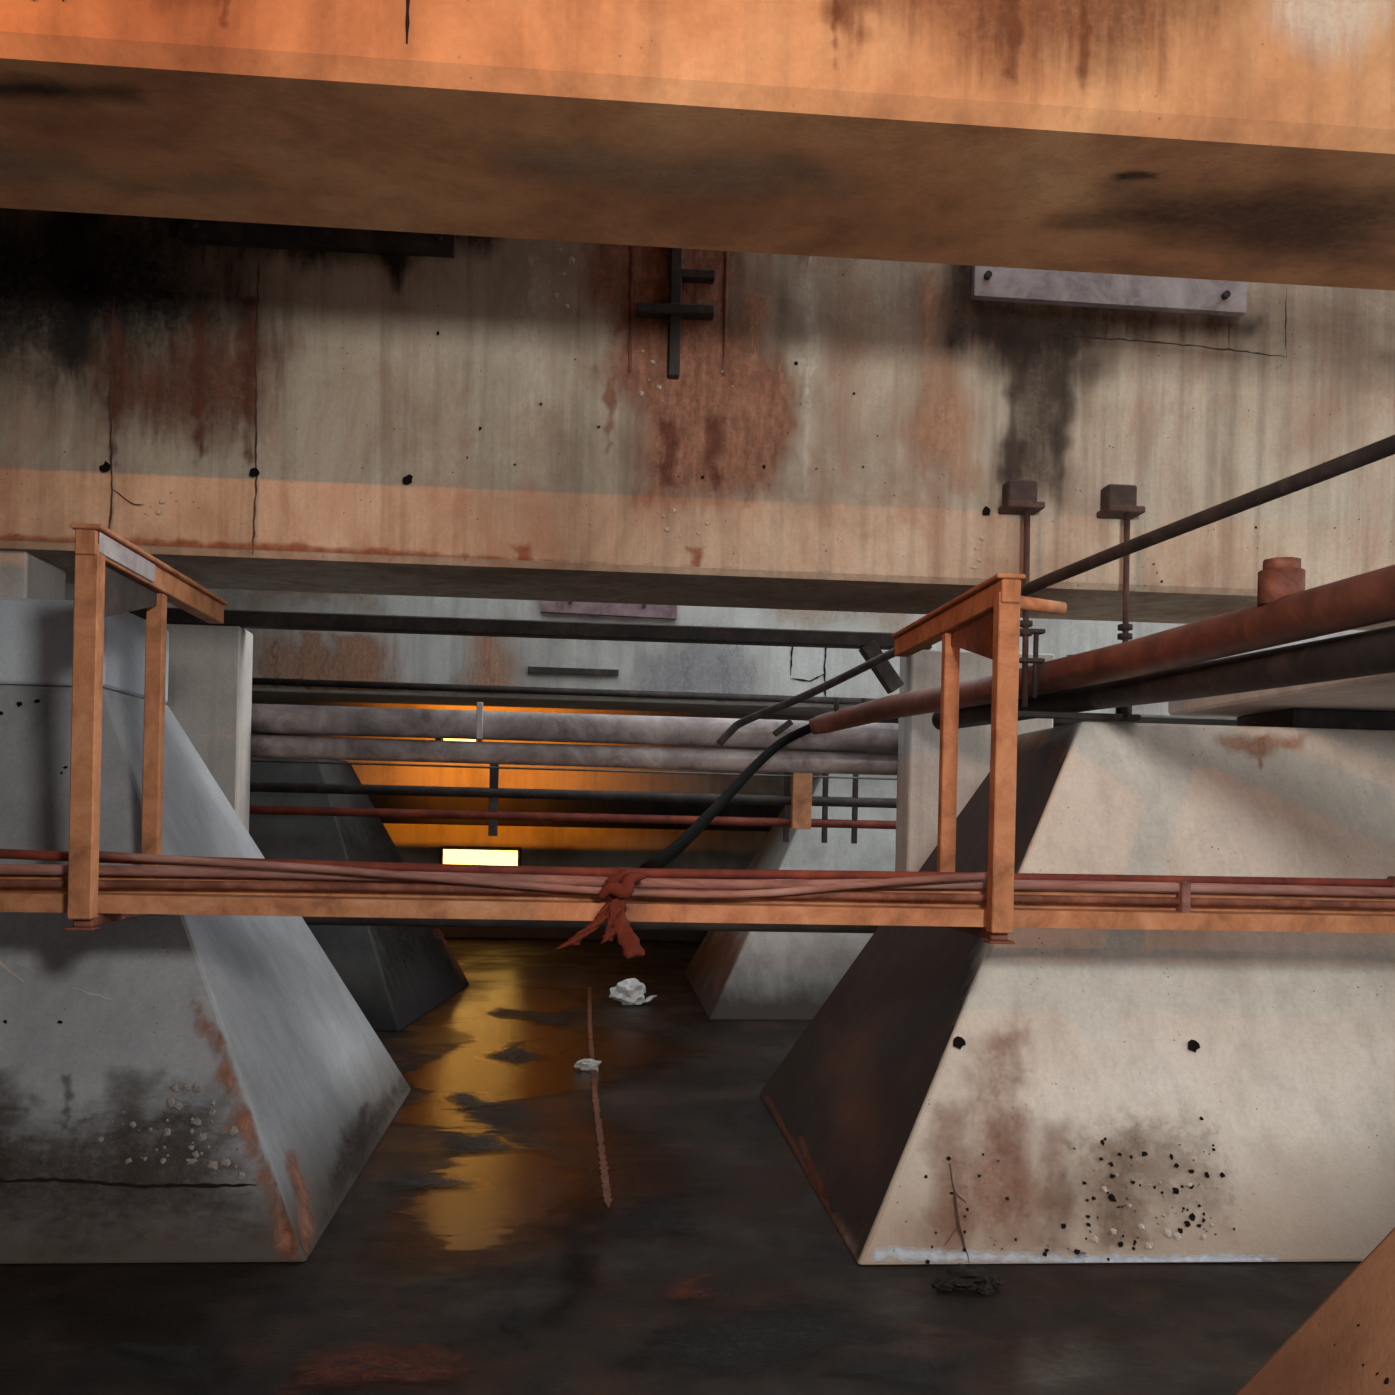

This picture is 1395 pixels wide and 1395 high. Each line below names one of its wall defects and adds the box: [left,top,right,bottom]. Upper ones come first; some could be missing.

crack [403,0,411,44]
corrosion [590,243,799,499]
water stain [939,264,1256,489]
water stain [918,846,937,872]
water stain [955,772,990,872]
water stain [1014,729,1072,873]
corrosion [1222,737,1298,767]
water stain [0,1107,233,1237]
crack [0,1177,257,1189]
spalling [92,1082,245,1180]
water stain [759,925,1277,1263]
spalling [1067,1137,1225,1261]